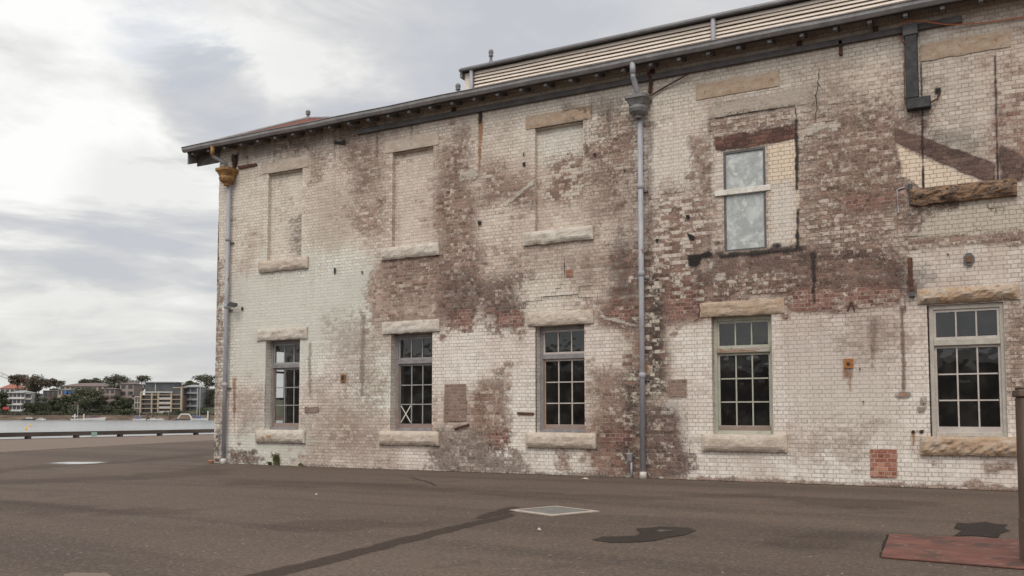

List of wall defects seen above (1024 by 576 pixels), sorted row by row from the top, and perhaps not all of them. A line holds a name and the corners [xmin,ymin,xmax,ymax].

crack [708,68,820,120]
peeling [334,127,386,237]
peeling [363,90,1024,478]